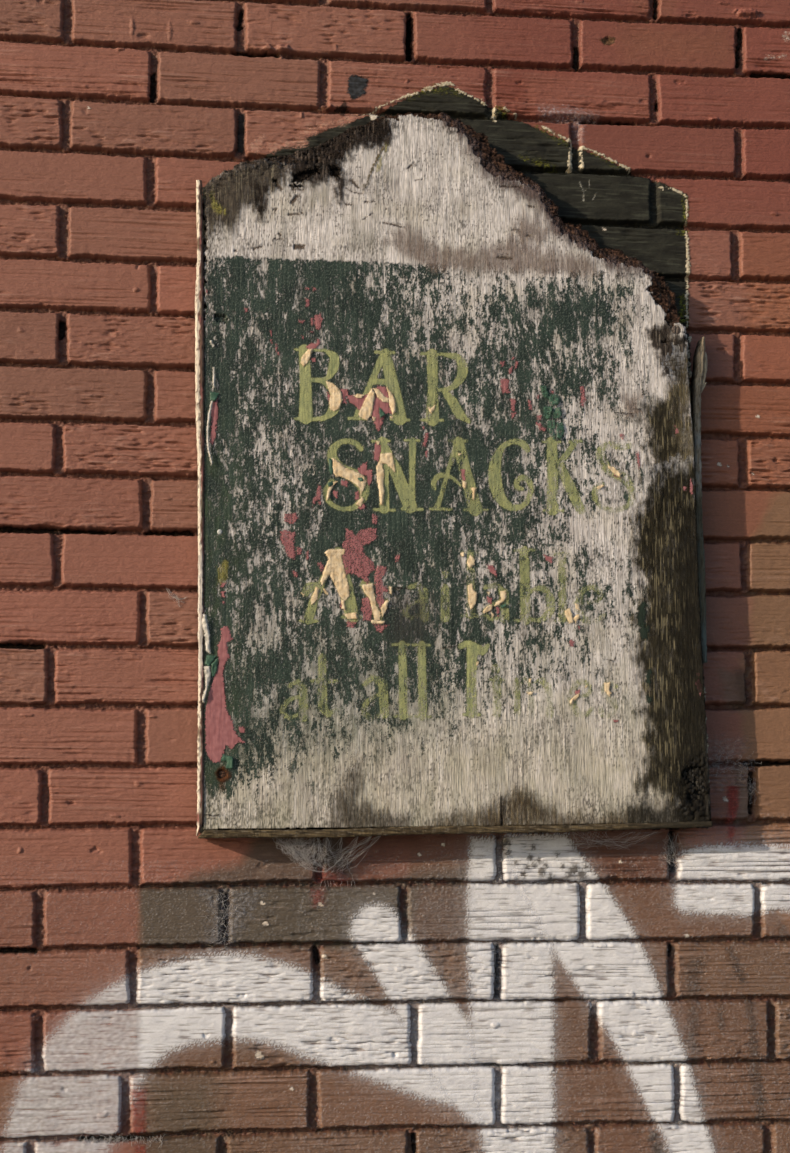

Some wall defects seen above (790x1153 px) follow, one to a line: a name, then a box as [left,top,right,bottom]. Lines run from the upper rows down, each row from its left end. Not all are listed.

peeling [237,114,245,154]
peeling [266,74,692,393]
peeling [200,818,357,833]